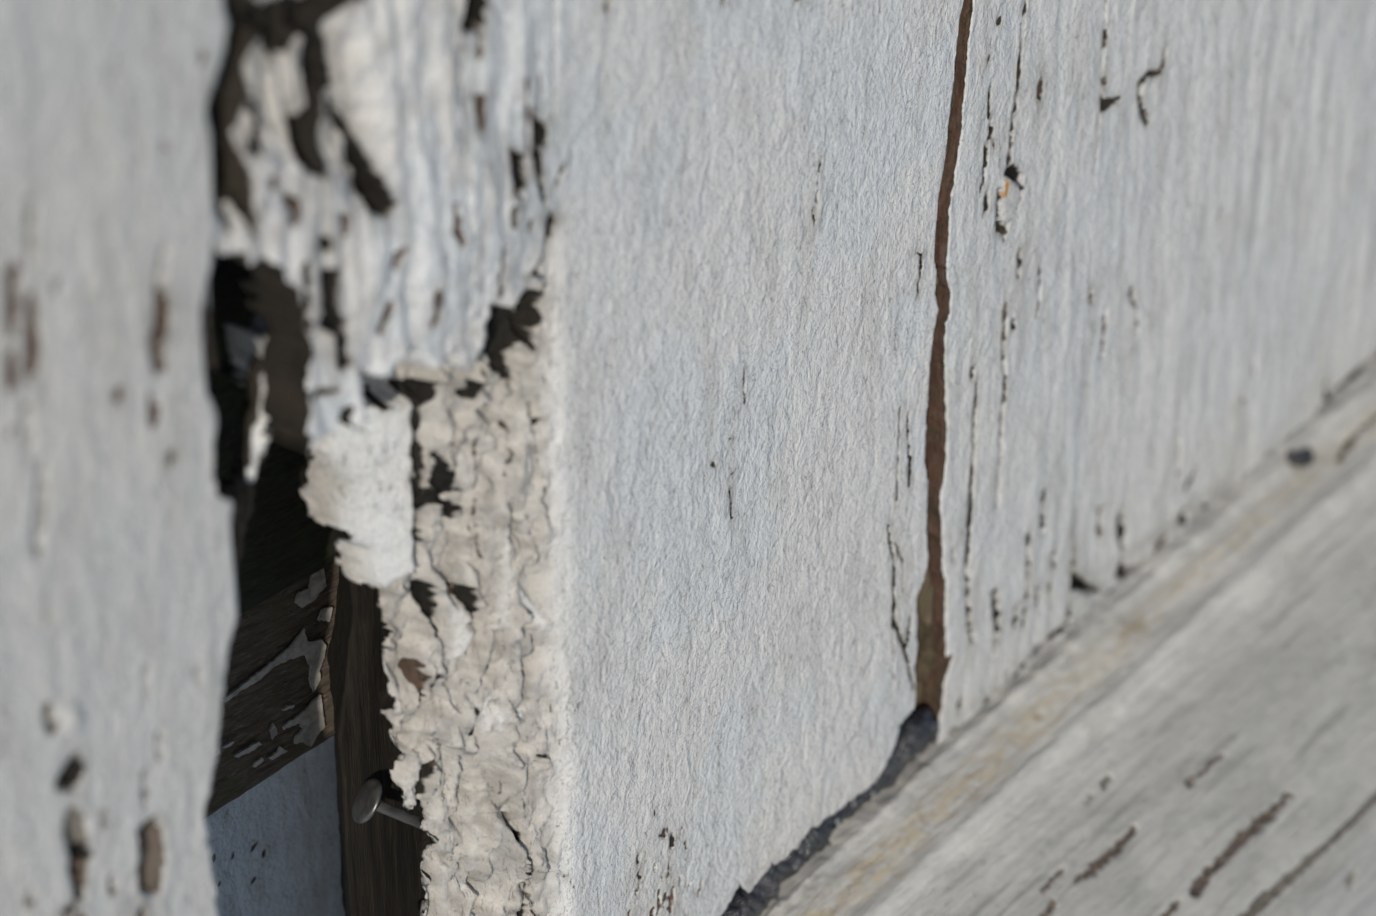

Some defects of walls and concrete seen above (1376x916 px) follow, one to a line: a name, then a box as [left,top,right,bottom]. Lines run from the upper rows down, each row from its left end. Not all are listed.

crack [947,0,1029,220]
spalling [450,198,469,252]
peeling [206,0,418,590]
spalling [428,286,445,331]
spalling [496,240,508,300]
crack [914,248,939,302]
spalling [452,376,482,402]
crack [885,396,937,705]
peeling [294,568,333,622]
peeling [427,519,554,663]
peeling [220,694,325,767]